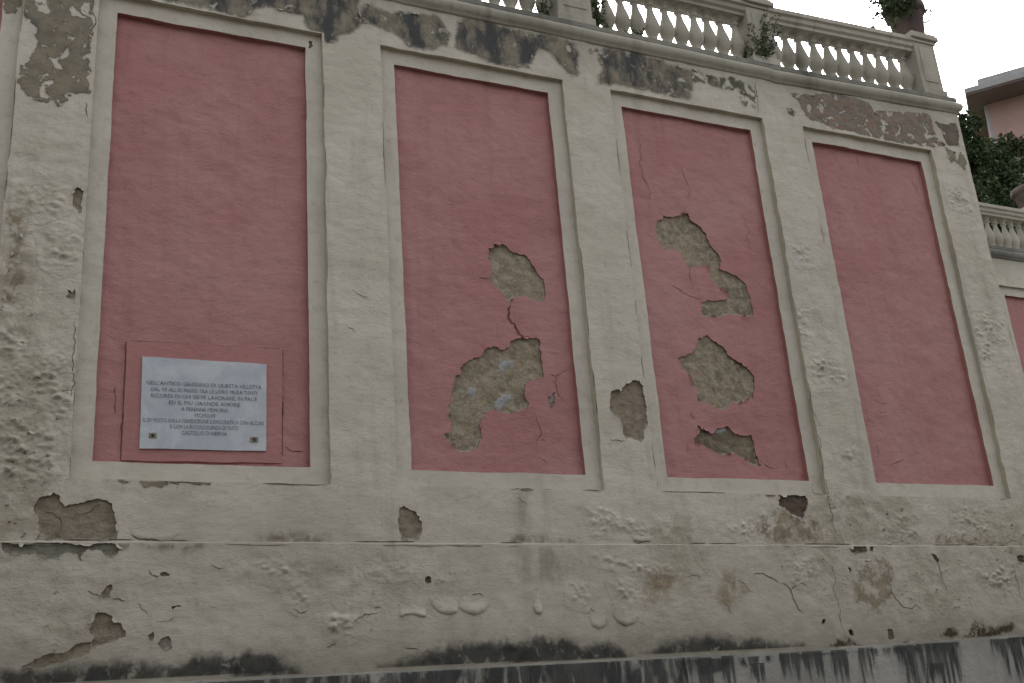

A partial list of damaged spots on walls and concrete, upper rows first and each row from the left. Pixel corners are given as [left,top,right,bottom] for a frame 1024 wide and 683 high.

peeling [3,0,94,107]
peeling [167,0,756,108]
peeling [787,93,967,170]
spalling [656,212,753,318]
crack [507,304,529,337]
spalling [444,337,544,453]
spalling [609,380,648,442]
spalling [2,492,123,561]
spalling [759,494,820,543]
crack [723,573,807,613]
spalling [22,612,126,673]
damp [1,623,1024,683]